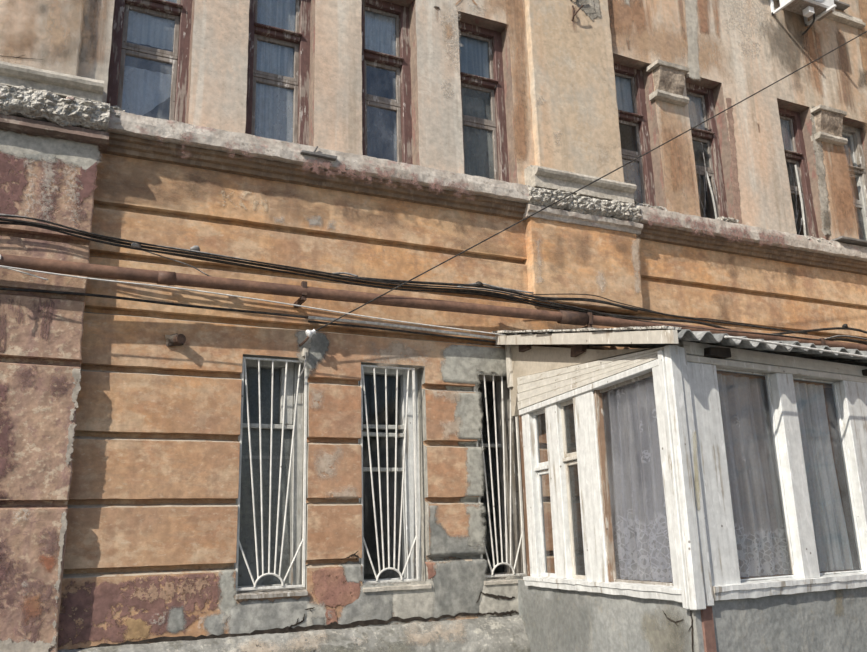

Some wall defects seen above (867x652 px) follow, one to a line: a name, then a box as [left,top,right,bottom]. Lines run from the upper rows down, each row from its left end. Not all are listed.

spalling [576,0,602,21]
water stain [608,0,717,78]
spalling [0,84,125,132]
spalling [526,98,785,246]
peeling [0,384,15,478]
spalling [48,368,81,467]
peeling [0,511,222,652]
peeling [297,567,361,647]